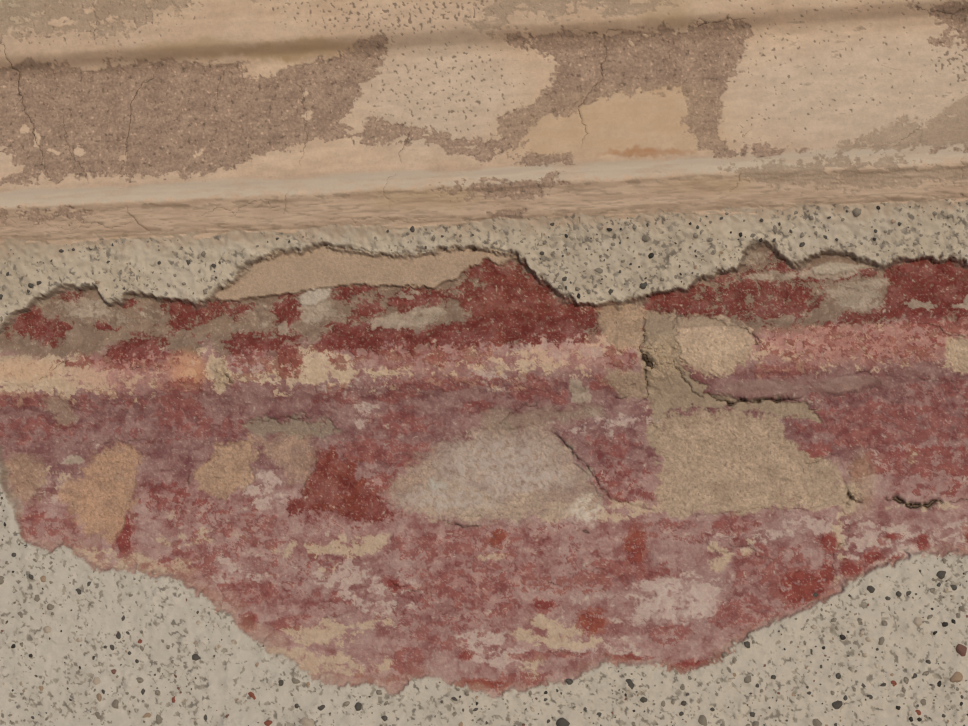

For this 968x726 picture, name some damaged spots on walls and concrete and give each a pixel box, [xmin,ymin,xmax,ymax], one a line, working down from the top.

crack [1,44,51,179]
peeling [0,0,968,220]
peeling [0,205,96,227]
crack [612,313,797,406]
spalling [0,240,968,700]